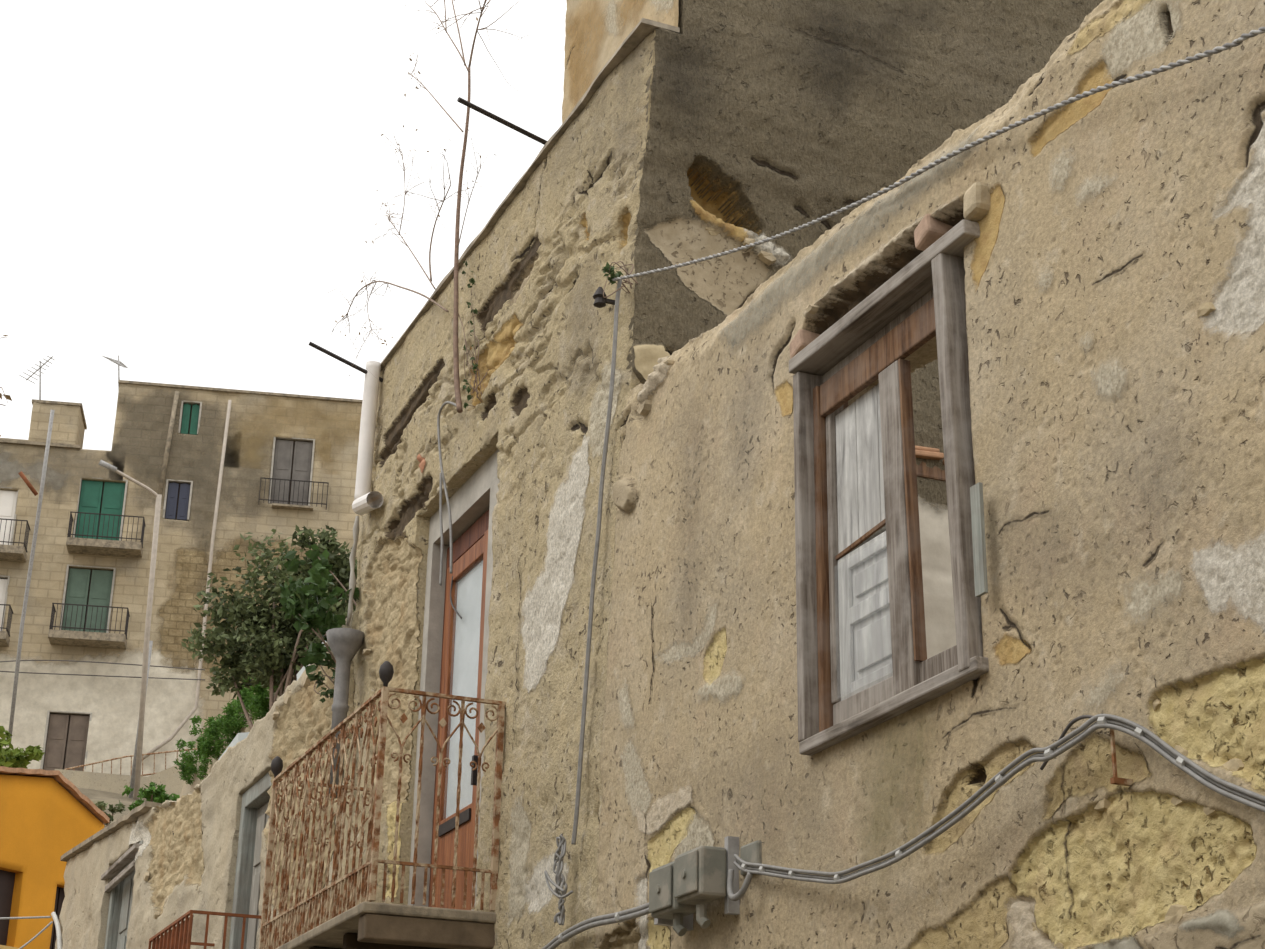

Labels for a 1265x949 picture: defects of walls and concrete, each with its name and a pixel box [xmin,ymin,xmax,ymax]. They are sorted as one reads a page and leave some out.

spalling [1068,0,1152,54]
spalling [1162,6,1175,45]
spalling [1030,60,1113,157]
spalling [621,212,631,247]
peeling [644,167,789,316]
spalling [1197,121,1265,335]
spalling [469,314,523,420]
spalling [512,387,530,416]
crack [647,608,655,704]
spalling [655,603,742,702]
spalling [1149,657,1265,792]
spalling [908,734,1257,949]